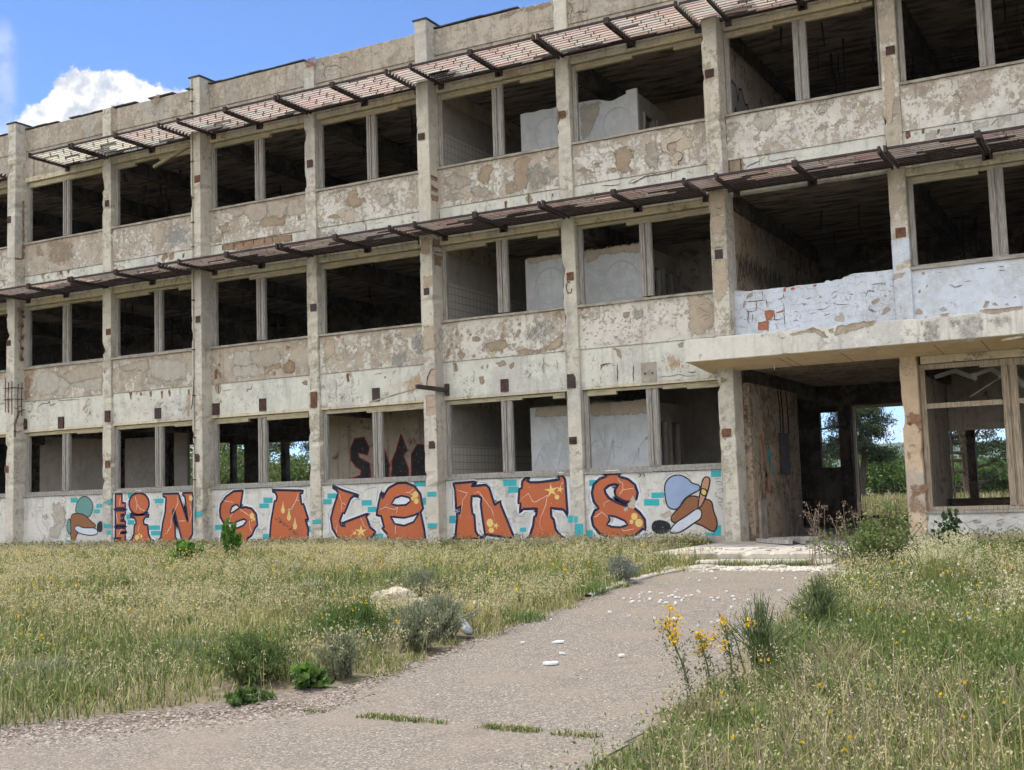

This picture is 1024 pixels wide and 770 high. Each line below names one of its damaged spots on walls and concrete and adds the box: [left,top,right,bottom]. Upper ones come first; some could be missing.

peeling [577,128,693,179]
peeling [327,188,391,222]
peeling [431,155,531,219]
flaking render [758,310,783,330]
peeling [232,345,307,385]